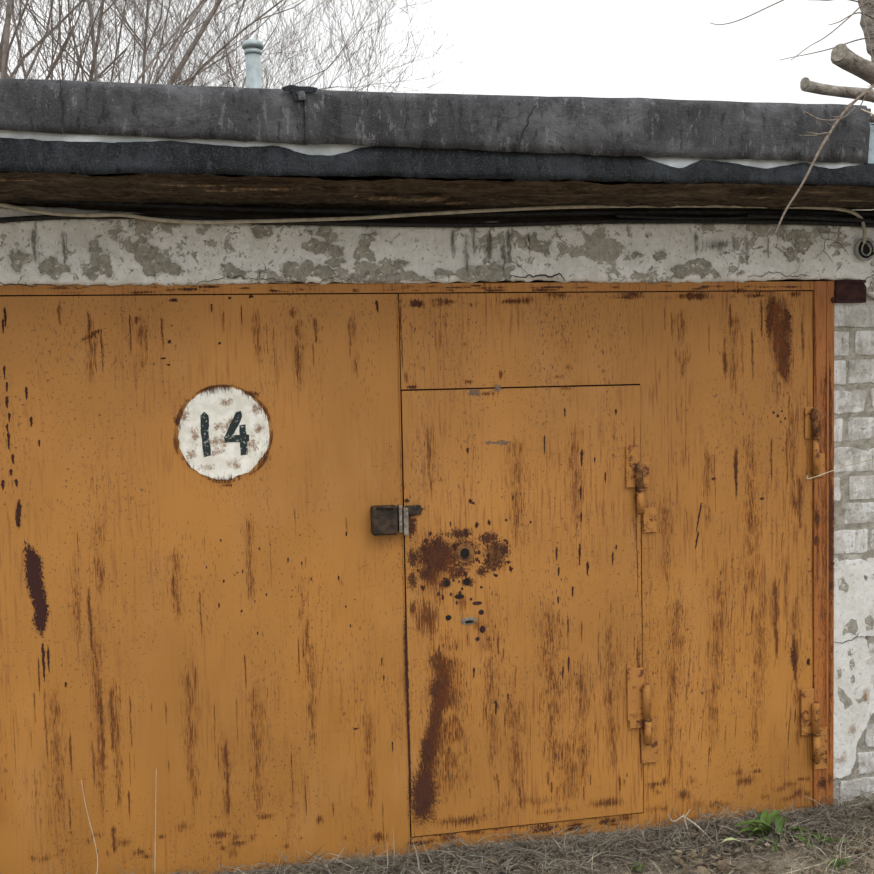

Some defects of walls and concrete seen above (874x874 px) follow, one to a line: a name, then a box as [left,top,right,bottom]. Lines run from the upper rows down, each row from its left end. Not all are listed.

peeling [9,238,114,281]
peeling [132,235,185,277]
peeling [280,226,347,282]
peeling [349,260,515,282]
corrosion [434,285,586,306]
peeling [653,249,722,279]
corrosion [1,365,18,489]
corrosion [708,286,835,799]
corrosion [21,541,72,834]
corrosion [73,558,132,816]
corrosion [404,431,640,846]
flaking render [833,557,874,779]